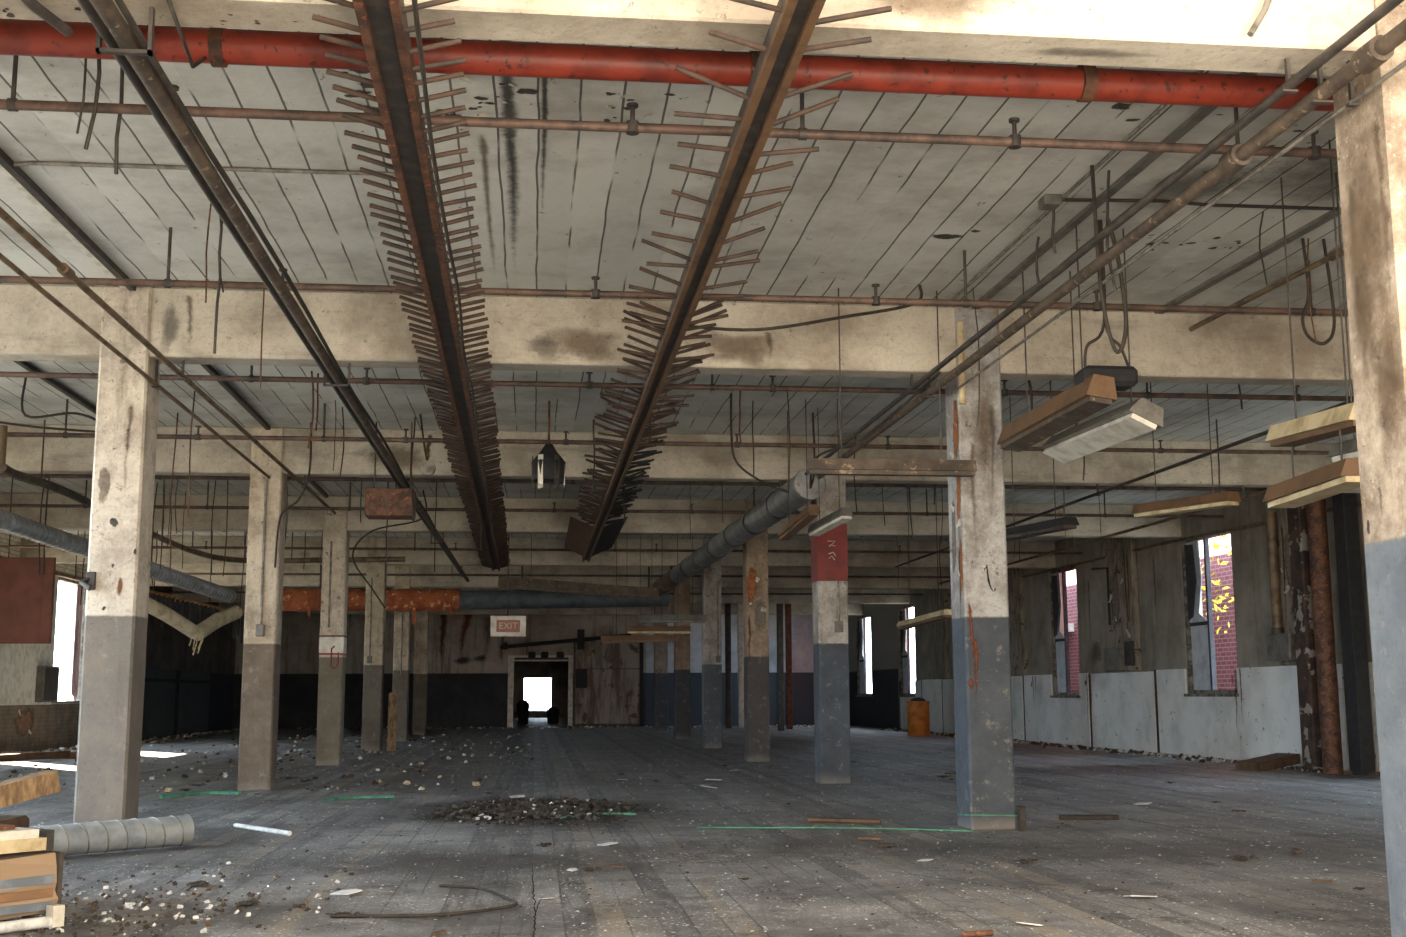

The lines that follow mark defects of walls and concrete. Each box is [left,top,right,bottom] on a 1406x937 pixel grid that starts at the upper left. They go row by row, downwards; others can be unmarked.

water stain [481,139,491,232]
water stain [501,76,517,229]
water stain [560,333,608,354]